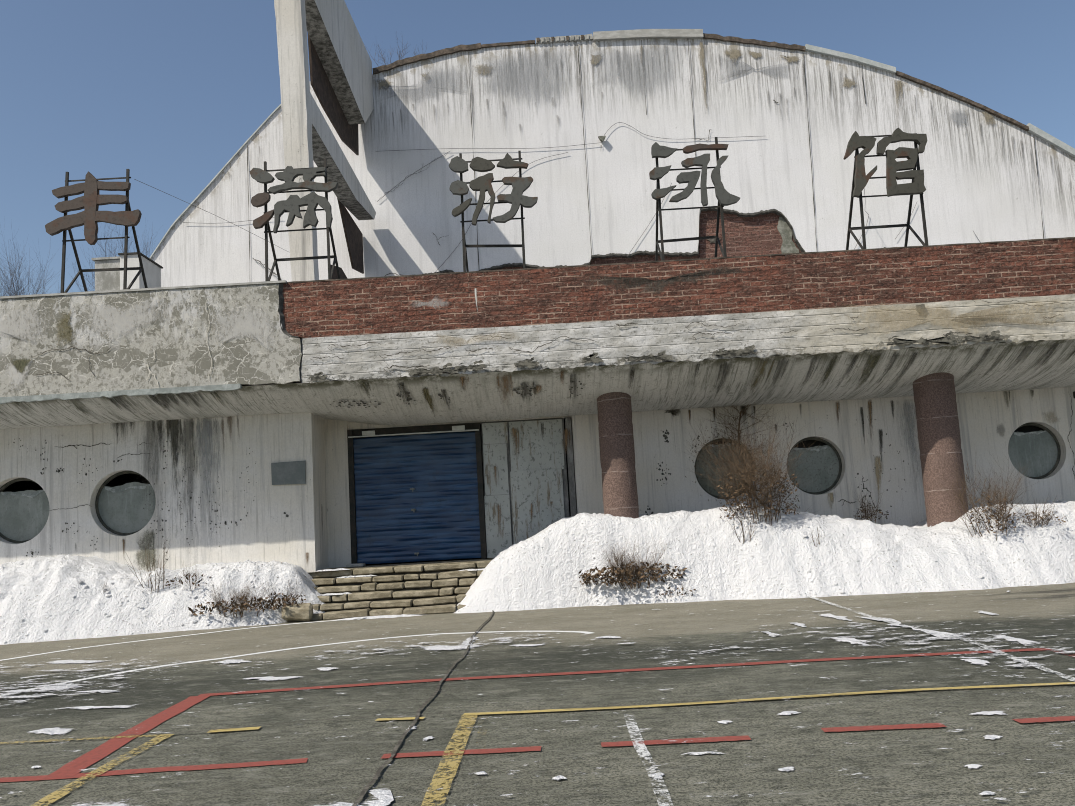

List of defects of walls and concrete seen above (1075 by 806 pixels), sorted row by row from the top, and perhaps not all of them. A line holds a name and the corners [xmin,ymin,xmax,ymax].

leakage [699,41,707,106]
spalling [583,208,805,265]
spalling [478,263,567,271]
crack [34,346,111,380]
crack [204,300,212,382]
peeling [216,284,302,347]
spalling [406,360,487,375]
spalling [580,352,603,363]
spalling [618,351,673,363]
spalling [709,345,762,357]
leakage [148,392,220,483]
crack [8,610,494,806]